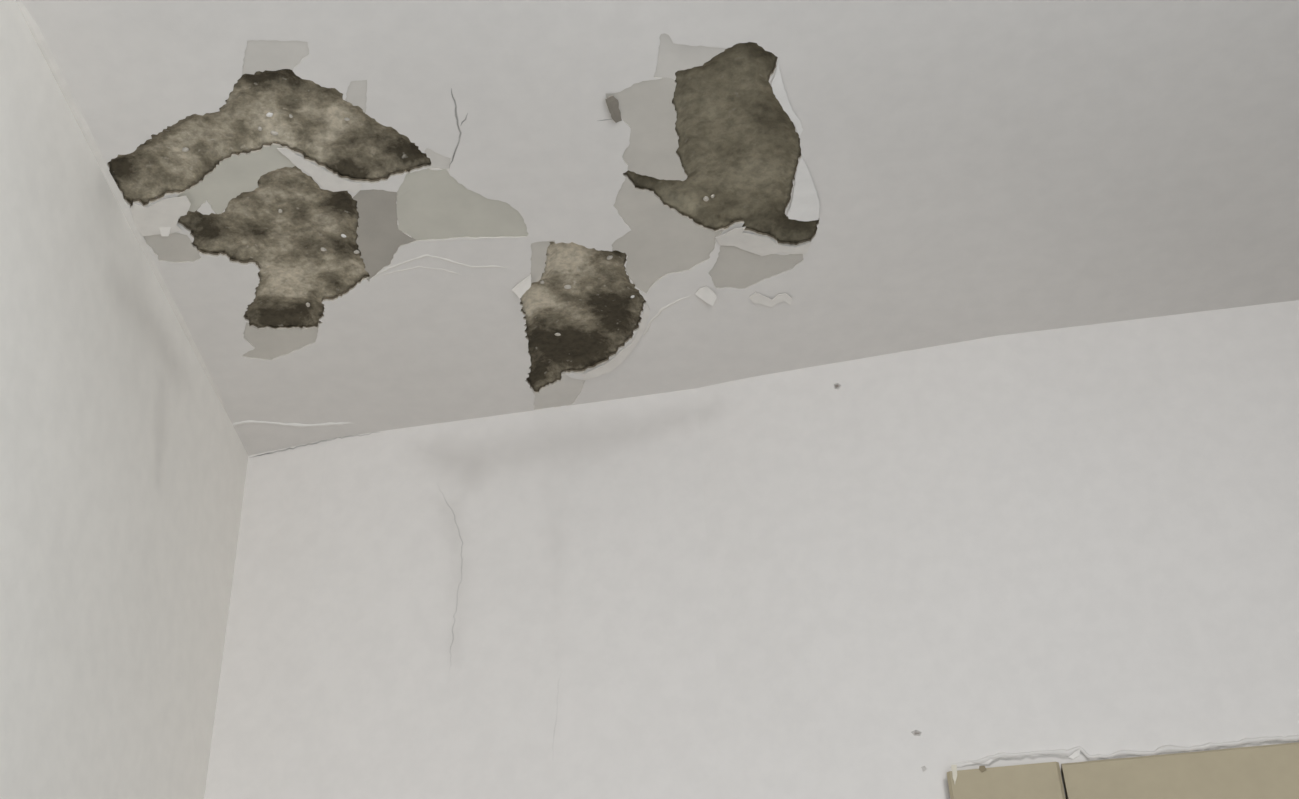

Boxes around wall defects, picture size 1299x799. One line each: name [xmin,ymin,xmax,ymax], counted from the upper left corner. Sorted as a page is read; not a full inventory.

spalling [107,33,820,410]